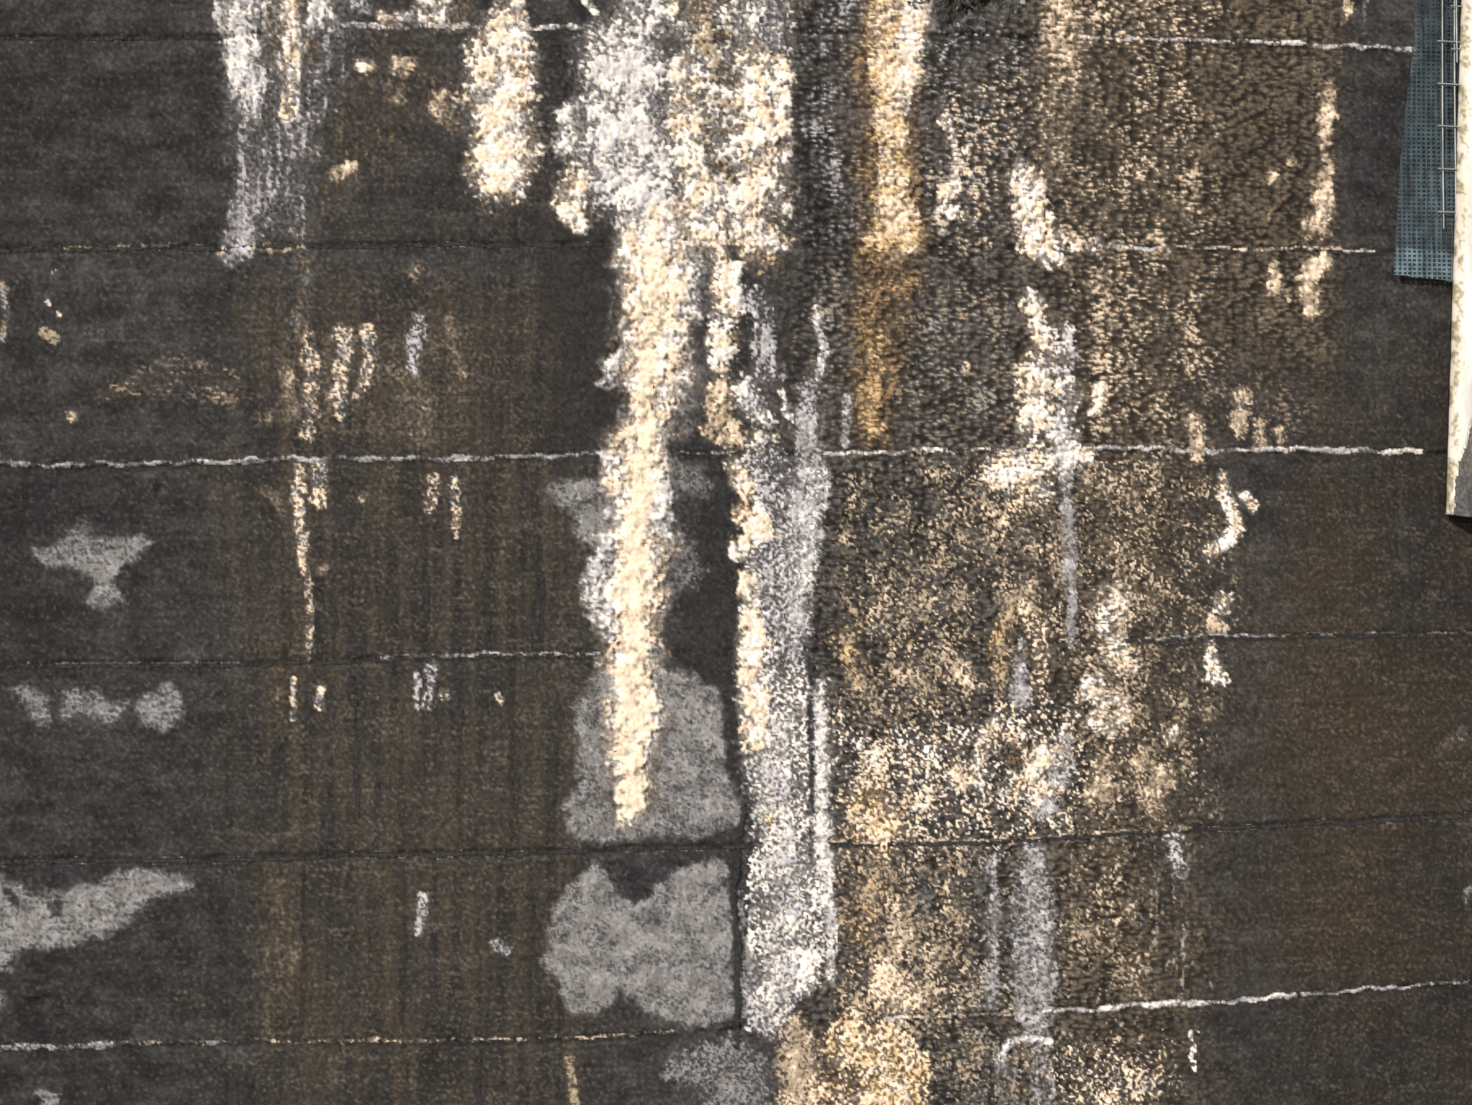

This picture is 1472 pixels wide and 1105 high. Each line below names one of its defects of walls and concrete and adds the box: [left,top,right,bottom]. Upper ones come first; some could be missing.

damp [936,114,976,221]
damp [1008,159,1097,271]
damp [1266,82,1339,319]
damp [1227,388,1285,452]
damp [212,0,839,1039]
damp [978,286,1140,739]
damp [1203,473,1259,563]
damp [1202,590,1233,722]
damp [947,718,1192,819]
damp [1165,828,1186,879]
damp [971,840,1058,1105]
damp [1188,1030,1200,1072]